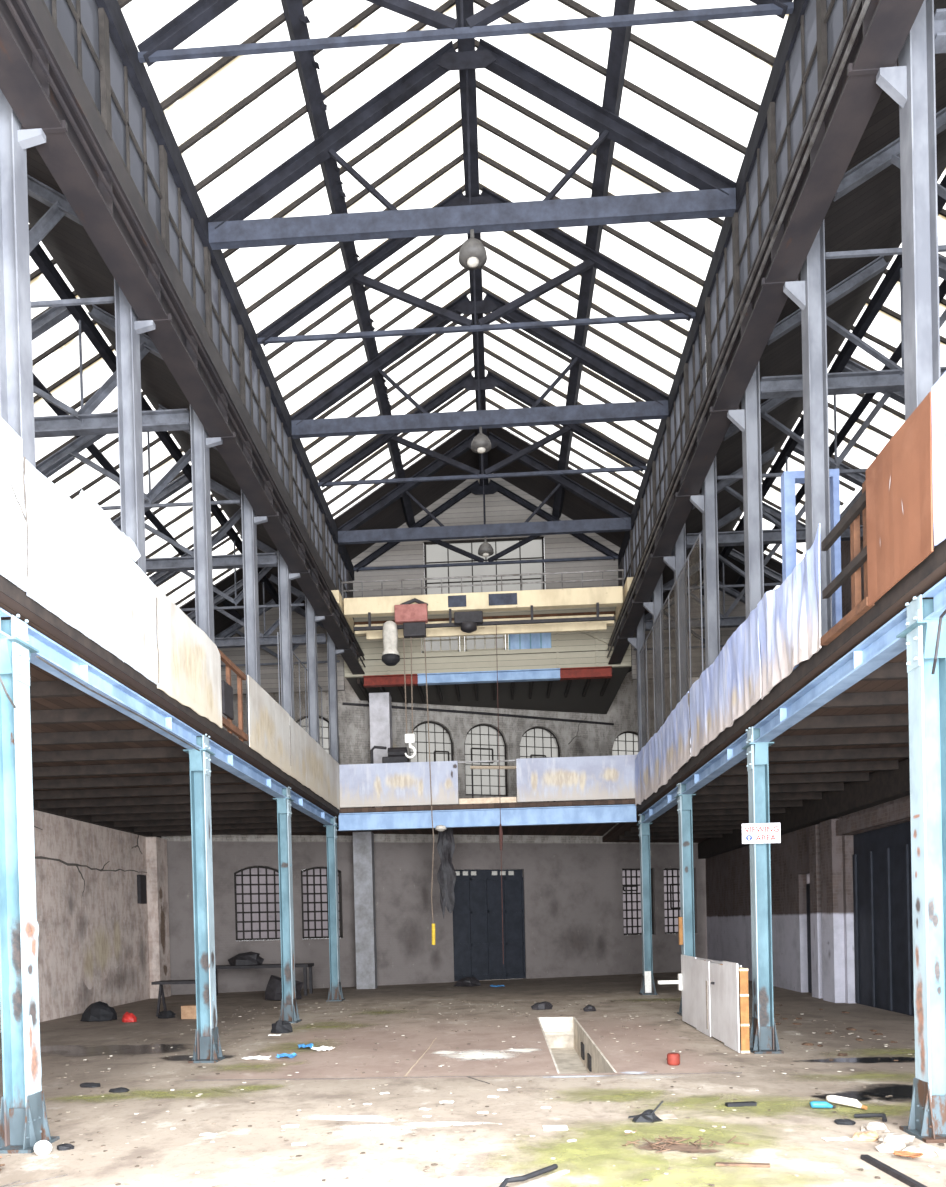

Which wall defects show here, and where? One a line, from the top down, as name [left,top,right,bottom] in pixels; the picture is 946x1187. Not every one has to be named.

crack [10,457,28,577]
corrosion [911,813,922,881]
corrosion [7,903,42,1095]
corrosion [914,939,927,1081]